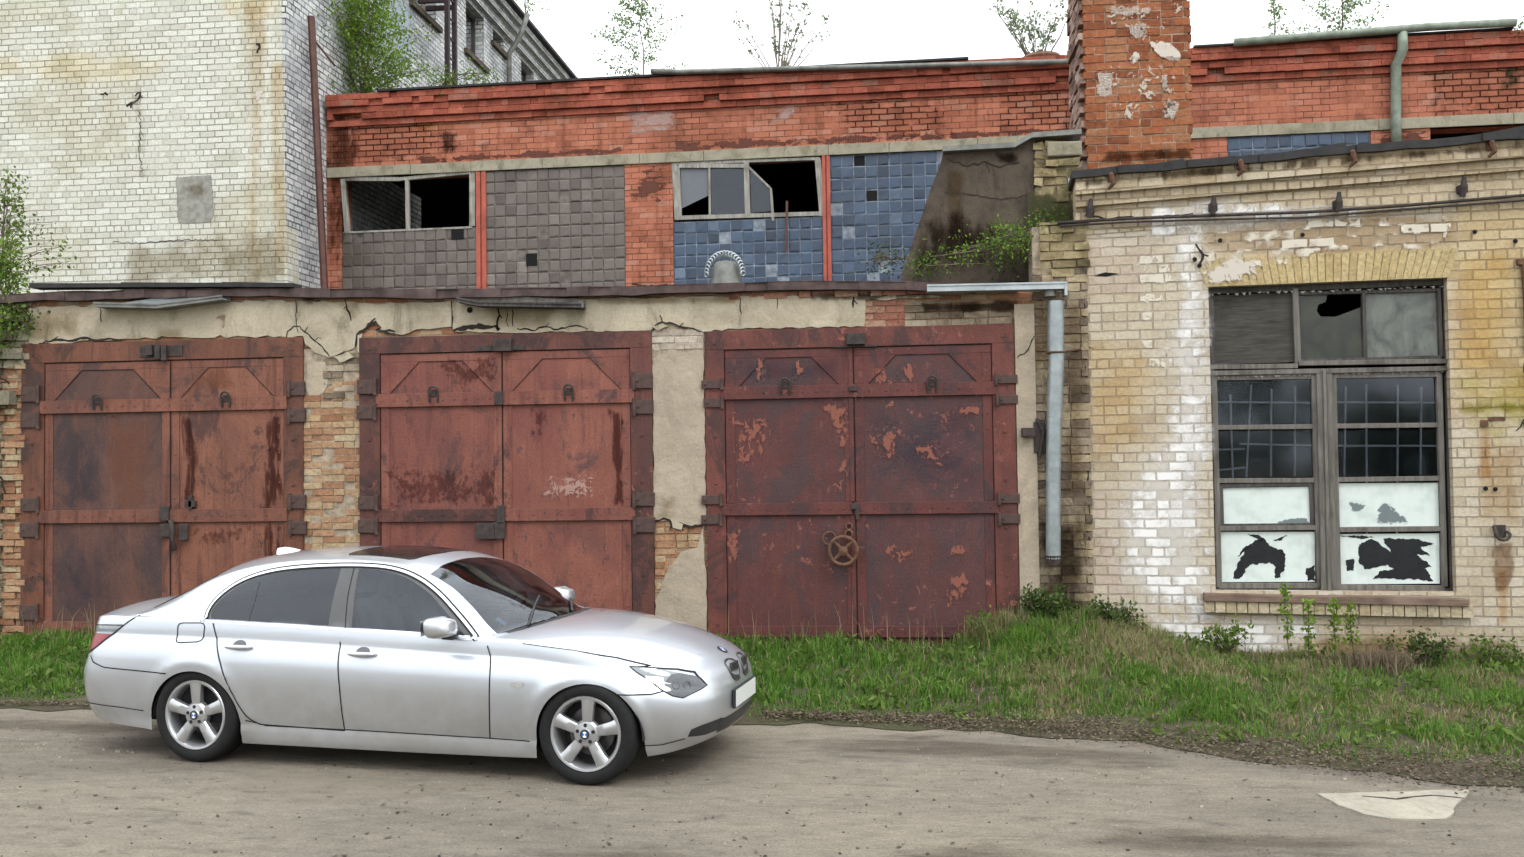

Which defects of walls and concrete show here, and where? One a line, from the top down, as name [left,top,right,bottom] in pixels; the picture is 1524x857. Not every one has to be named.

peeling [1194,219,1444,296]
peeling [1375,215,1451,249]
crack [286,299,395,357]
spalling [323,334,363,399]
peeling [730,412,771,466]
peeling [823,403,850,492]
peeling [869,428,902,458]
peeling [916,445,944,466]
peeling [934,406,979,431]
spalling [655,520,702,589]
peeling [727,529,741,564]
peeling [944,544,970,607]